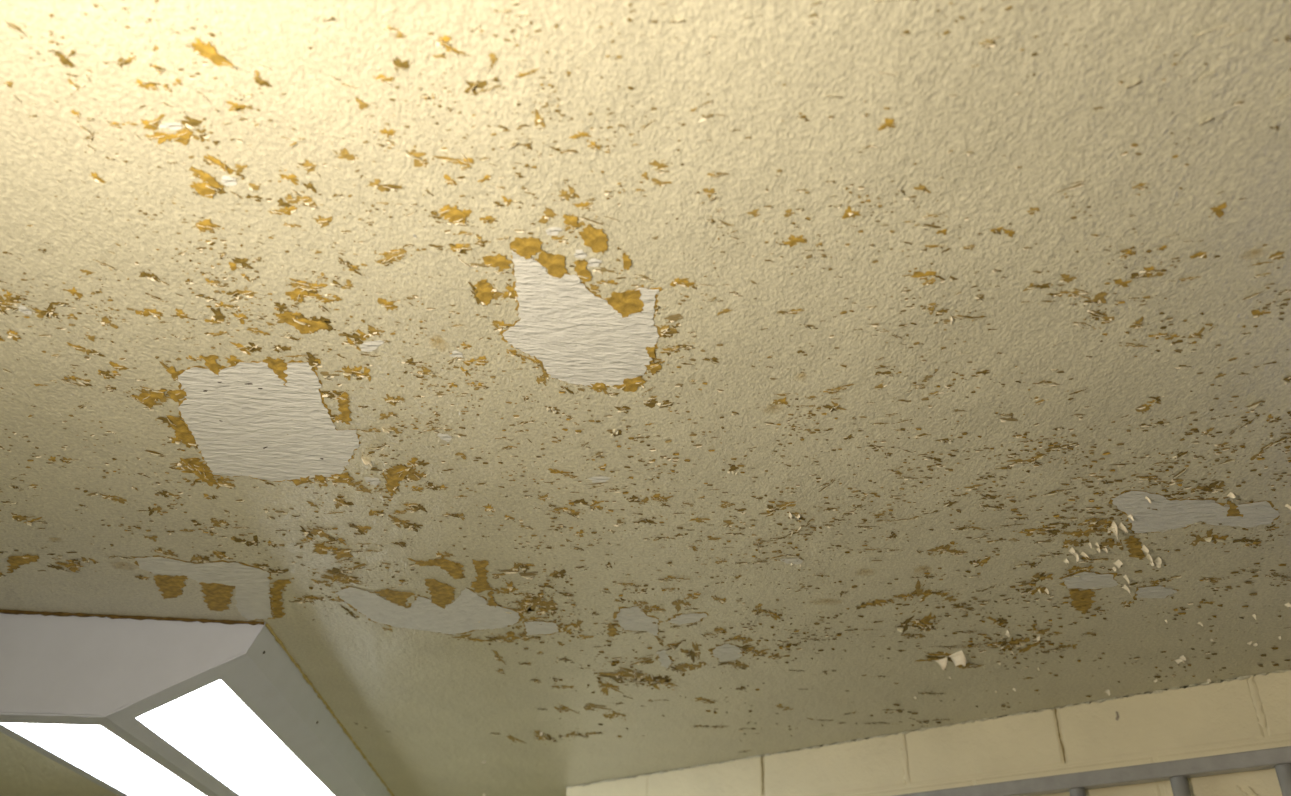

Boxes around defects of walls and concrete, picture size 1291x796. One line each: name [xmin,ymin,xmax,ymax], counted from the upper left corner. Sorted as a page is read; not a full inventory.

peeling [54,50,92,91]
peeling [184,30,287,125]
peeling [375,9,411,85]
peeling [433,36,471,70]
peeling [464,53,500,95]
peeling [881,177,1032,253]
peeling [901,269,1006,354]
peeling [1021,234,1207,327]
peeling [1126,316,1219,369]
flaking render [0,65,836,719]
peeling [752,357,959,480]
flaking render [823,401,1291,679]